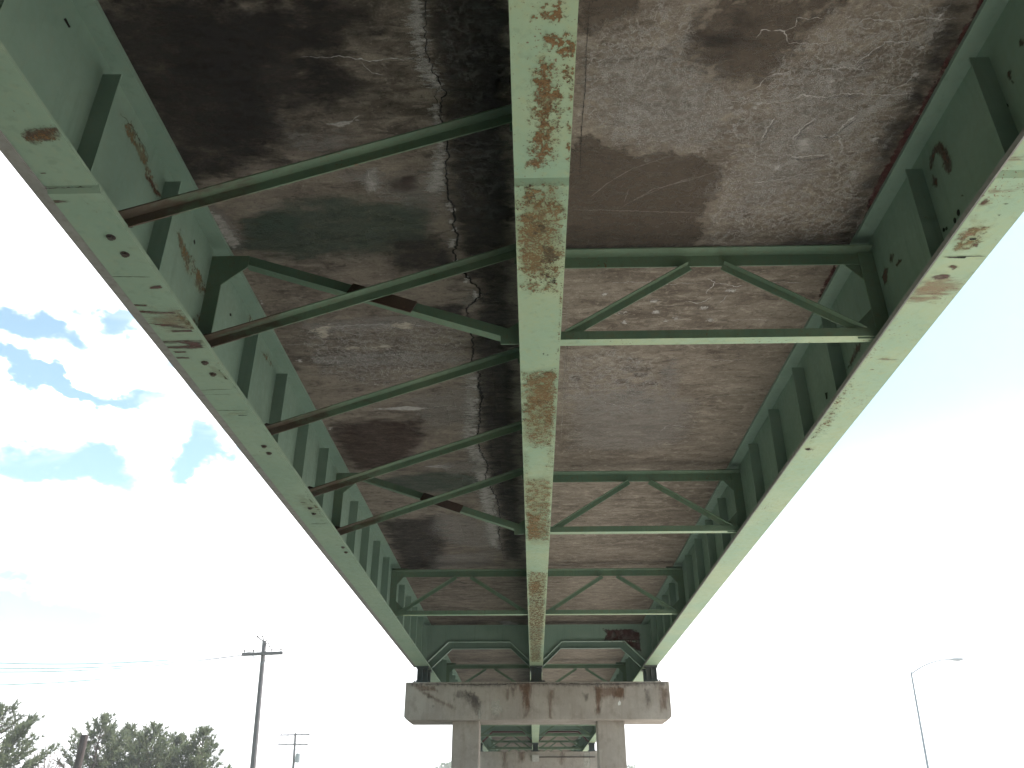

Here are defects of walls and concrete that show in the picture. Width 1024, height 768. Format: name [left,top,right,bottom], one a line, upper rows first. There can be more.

rust [23,128,59,143]
leakage [103,0,507,180]
leakage [395,127,510,271]
crack [410,1,504,556]
rust [515,184,566,355]
rust [525,1,576,169]
leakage [566,0,959,249]
crack [746,13,954,210]
rust [864,0,984,211]
rust [914,209,989,301]
leakage [329,405,451,468]
leakage [384,336,521,559]